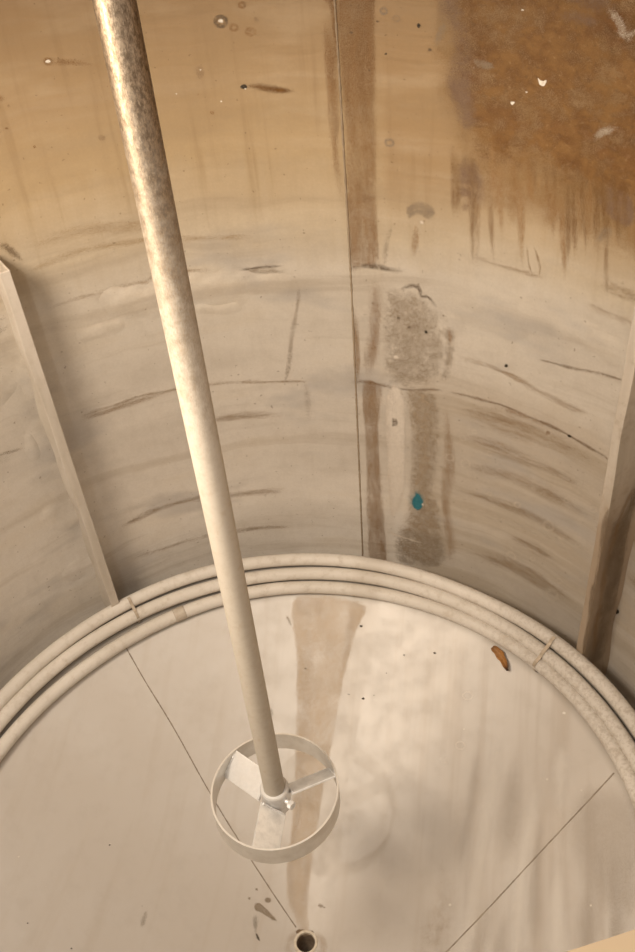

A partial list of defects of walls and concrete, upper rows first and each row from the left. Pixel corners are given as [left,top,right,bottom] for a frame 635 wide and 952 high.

leakage [322,0,635,663]